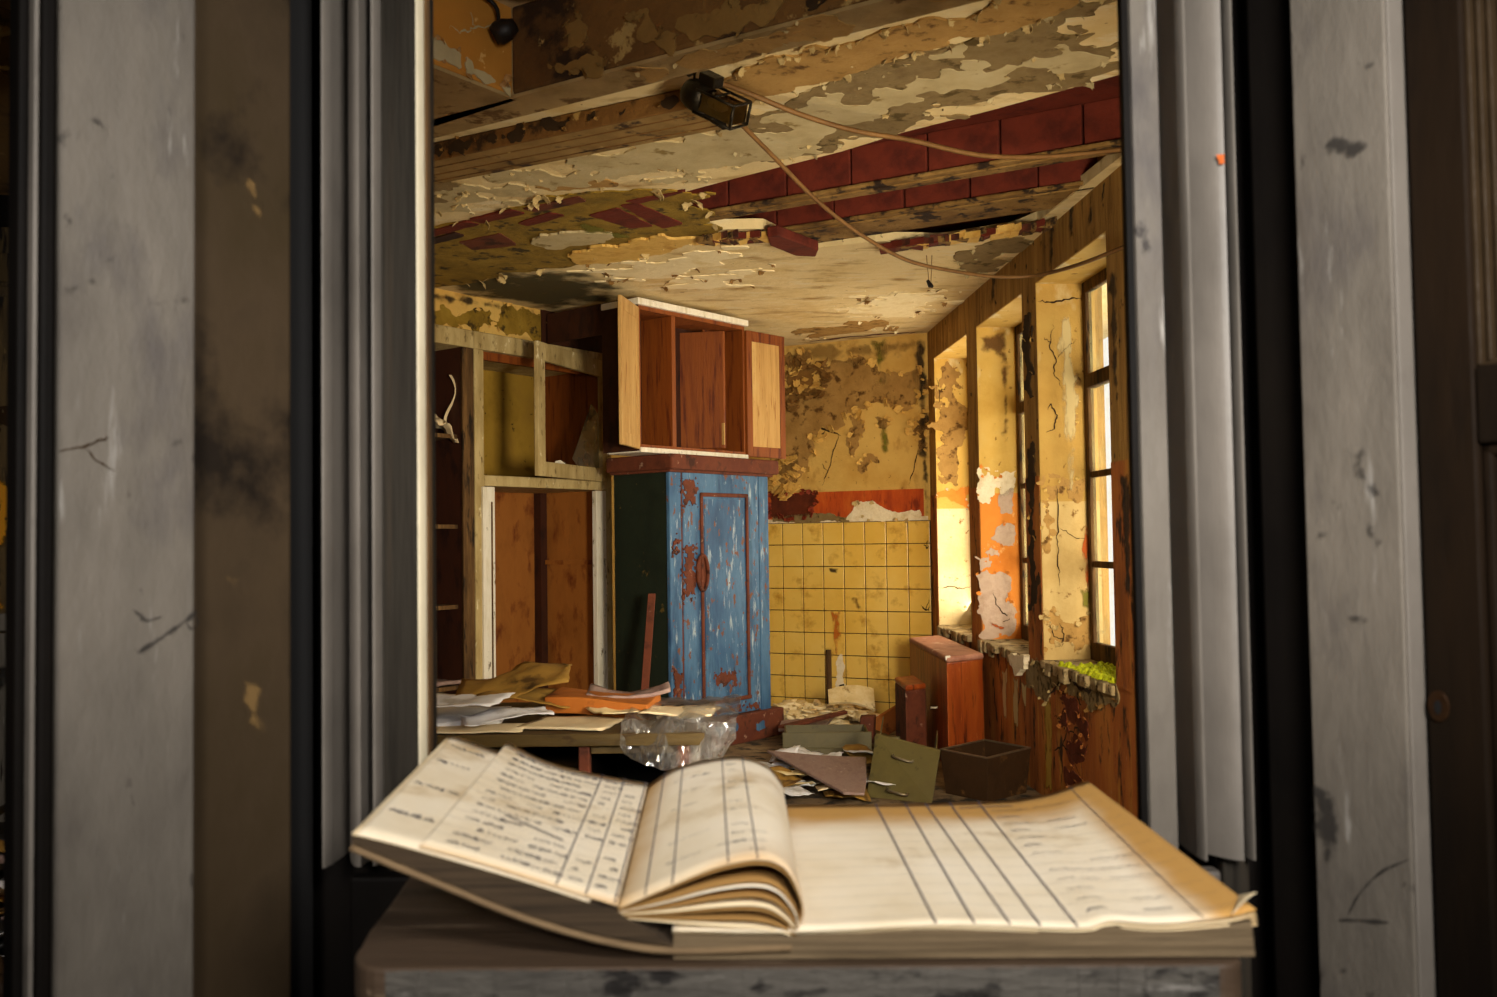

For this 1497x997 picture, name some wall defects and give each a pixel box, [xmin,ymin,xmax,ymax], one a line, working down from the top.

peeling [433,0,1119,292]
peeling [435,302,547,342]
peeling [768,232,1120,788]